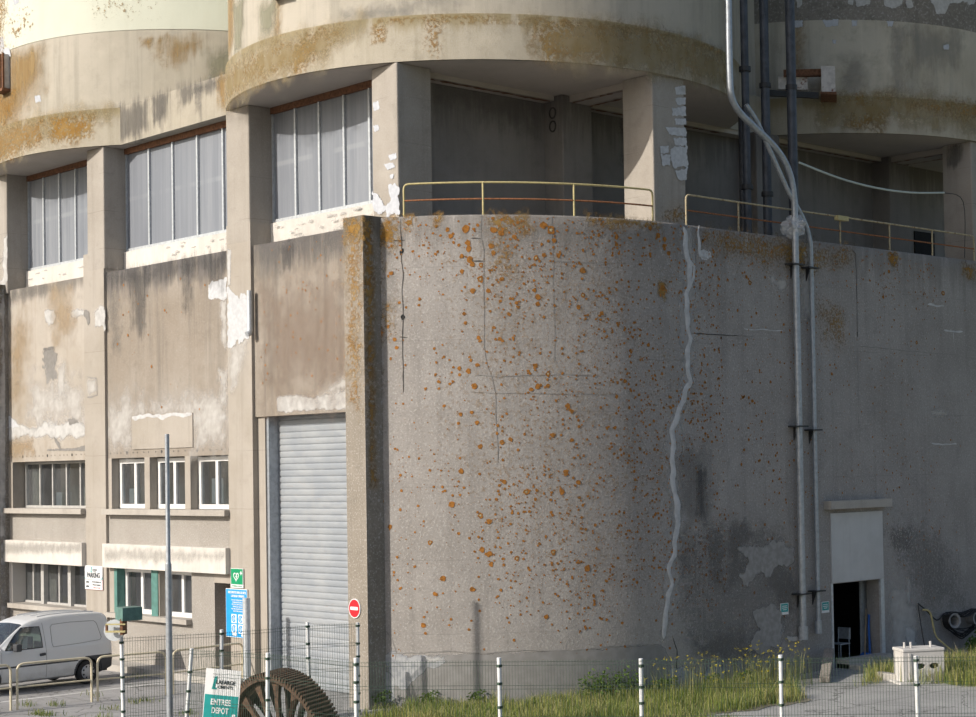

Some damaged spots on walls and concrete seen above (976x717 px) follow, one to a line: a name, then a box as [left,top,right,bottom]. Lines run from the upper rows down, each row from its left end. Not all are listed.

rust [0,50,38,126]
peeling [9,416,85,451]
crack [386,215,754,669]
flaking render [738,539,795,587]